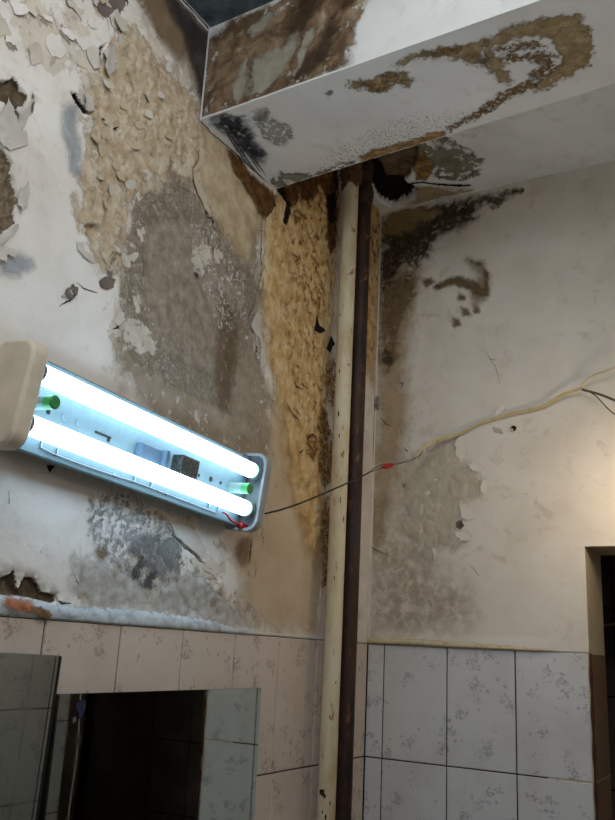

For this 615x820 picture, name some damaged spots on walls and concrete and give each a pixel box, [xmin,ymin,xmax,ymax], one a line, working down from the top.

spalling [372,145,471,205]
flaking render [0,0,270,455]
damp [143,0,595,630]
peeling [0,540,250,626]
damp [88,494,183,589]